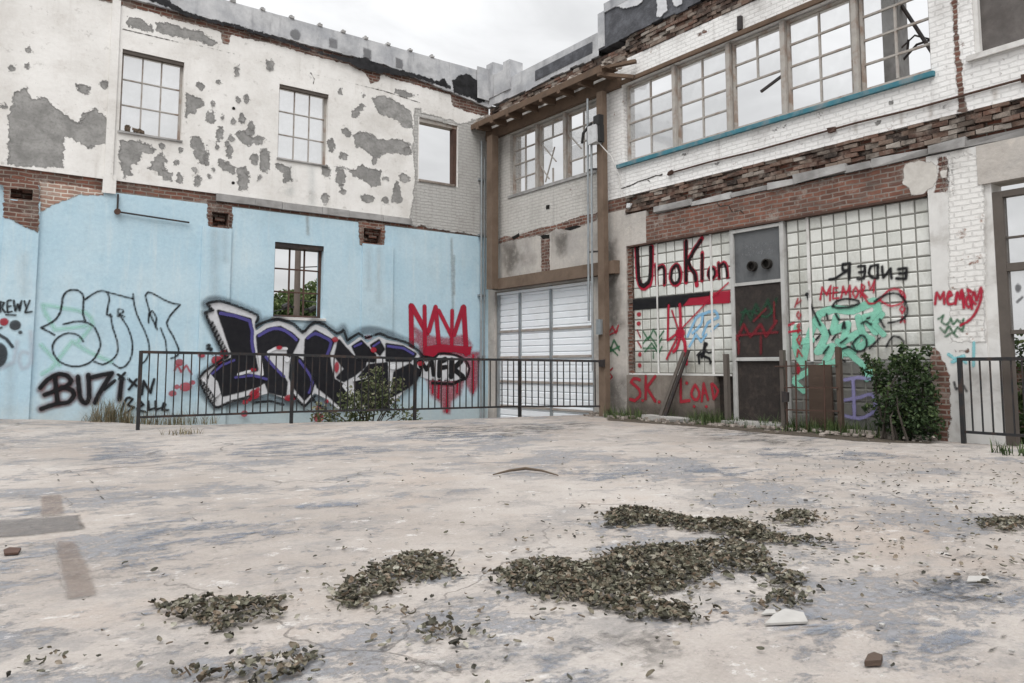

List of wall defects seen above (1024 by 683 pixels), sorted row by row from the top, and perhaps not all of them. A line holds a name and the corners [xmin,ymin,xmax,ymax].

peeling [616,0,643,8]
peeling [0,87,107,232]
peeling [75,80,108,95]
peeling [101,0,597,272]
spalling [625,0,1024,213]
flaking render [930,347,952,441]